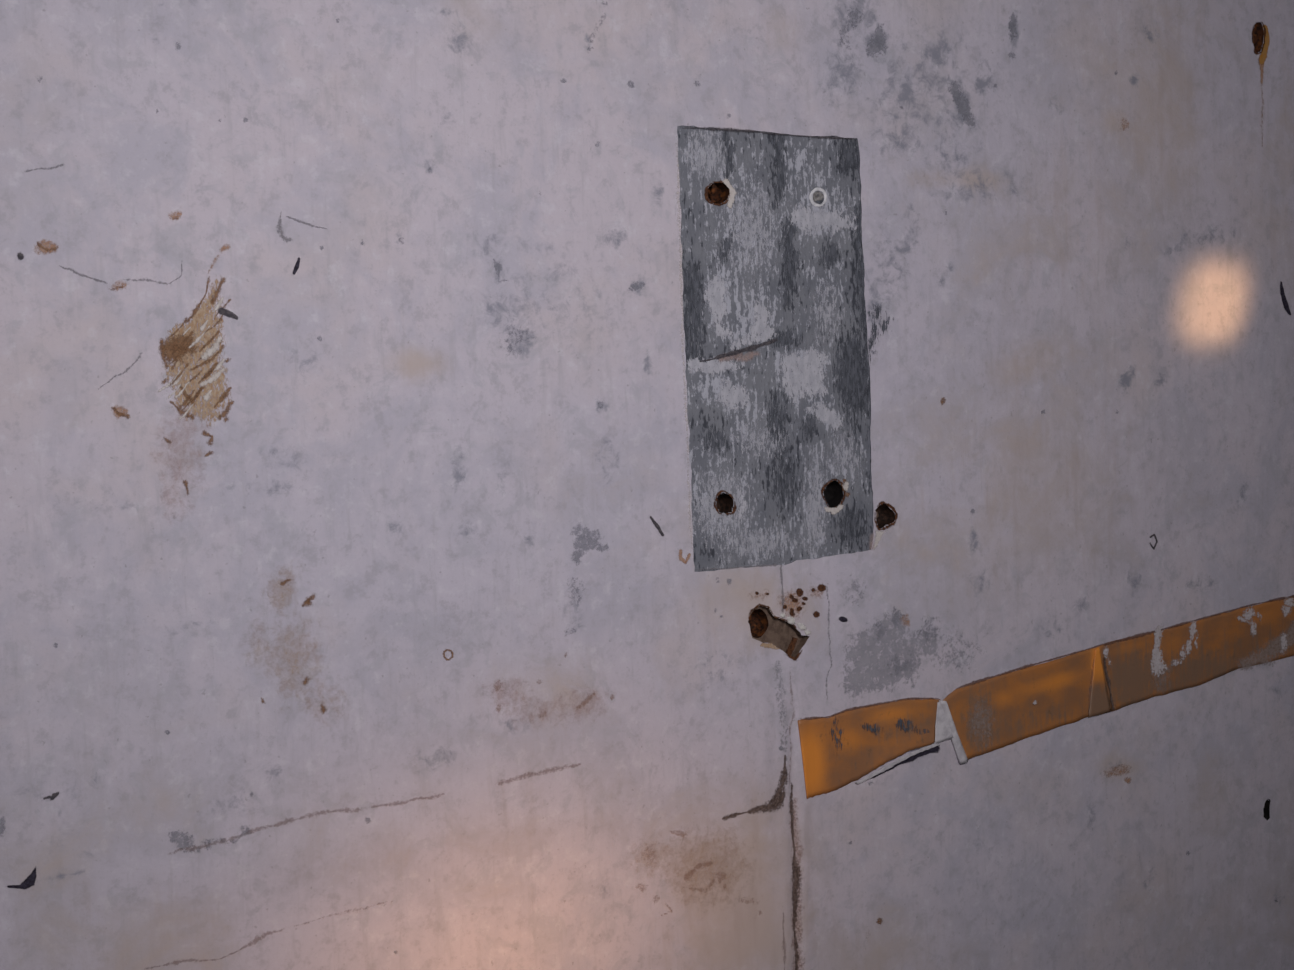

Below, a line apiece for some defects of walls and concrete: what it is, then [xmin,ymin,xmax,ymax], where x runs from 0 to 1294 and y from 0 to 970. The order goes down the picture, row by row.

crack [170,828,250,852]
crack [722,665,802,970]